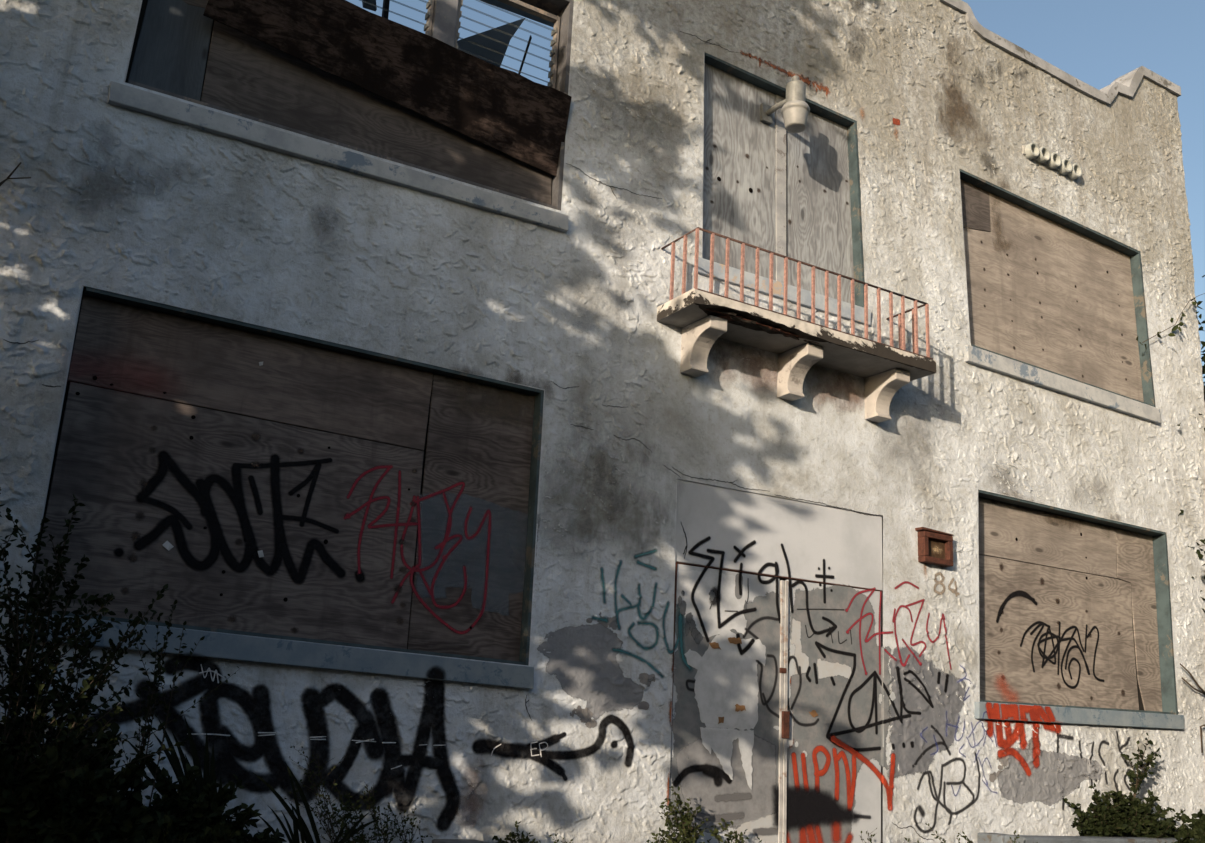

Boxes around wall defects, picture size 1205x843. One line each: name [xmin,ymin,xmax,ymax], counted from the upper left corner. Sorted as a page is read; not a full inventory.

corrosion [740,51,829,96]
peeling [537,612,655,728]
peeling [788,644,796,699]
peeling [989,737,1103,806]